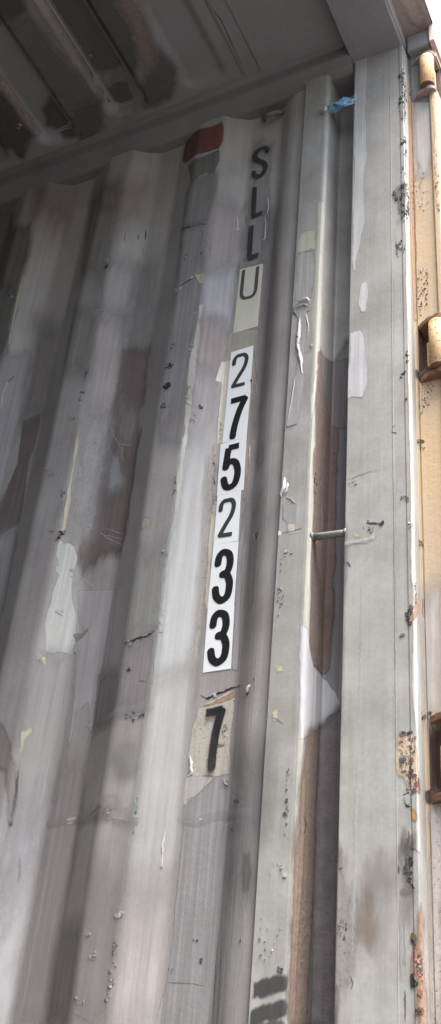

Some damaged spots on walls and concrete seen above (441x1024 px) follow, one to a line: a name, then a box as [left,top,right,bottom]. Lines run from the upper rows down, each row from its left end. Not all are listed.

peeling [36,531,77,666]
corrosion [410,904,428,1024]